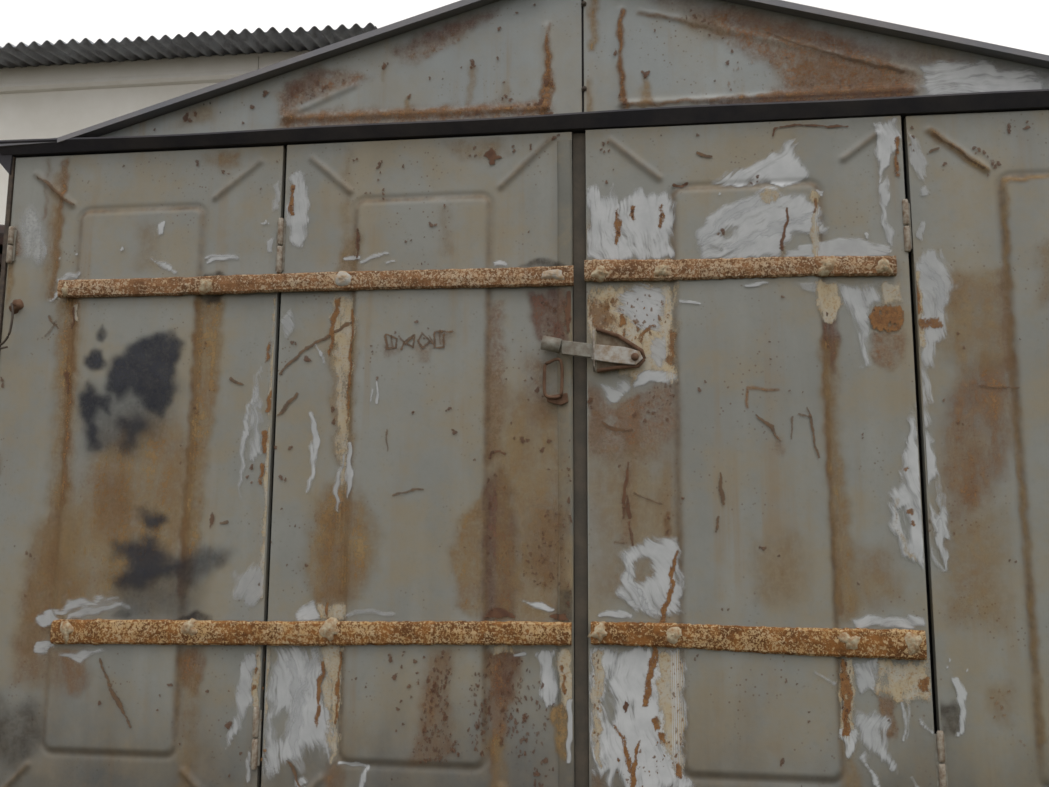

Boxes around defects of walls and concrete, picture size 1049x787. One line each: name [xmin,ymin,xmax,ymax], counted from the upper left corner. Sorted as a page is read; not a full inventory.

rust [613,9,688,108]
rust [710,87,903,105]
peeling [614,205,635,245]
rust [530,290,572,340]
peeling [666,330,677,366]
peeling [916,281,943,331]
peeling [659,550,680,623]
peeling [314,651,342,725]
rust [388,650,459,764]
rust [467,651,554,787]
peeling [642,647,666,744]